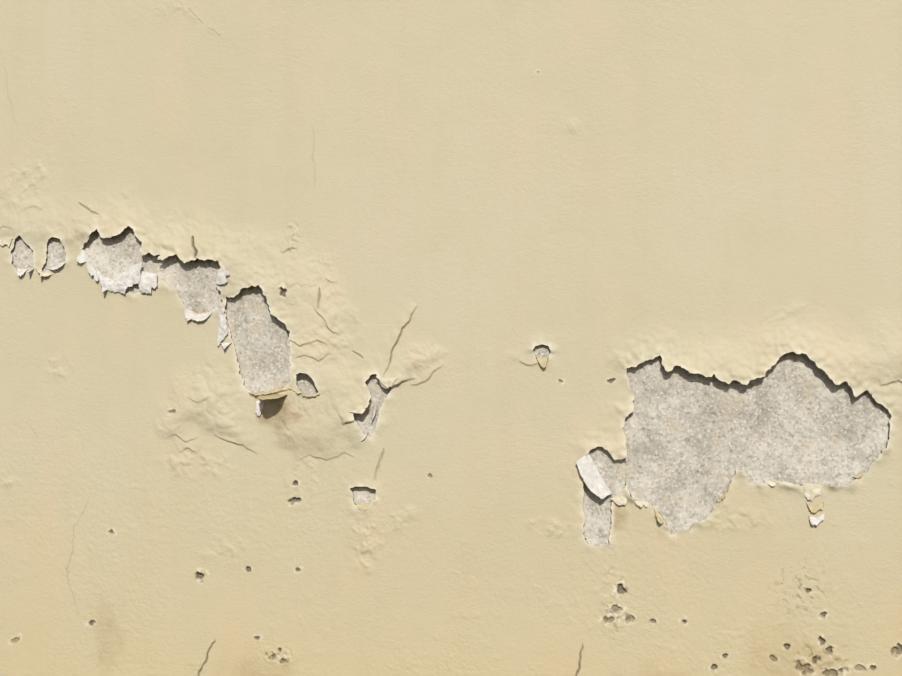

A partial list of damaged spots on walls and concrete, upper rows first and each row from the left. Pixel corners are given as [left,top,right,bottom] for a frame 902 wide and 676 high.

peeling [0,222,325,416]
crack [351,303,425,379]
peeling [527,338,555,368]
peeling [345,369,399,445]
peeling [576,344,898,551]
peeling [347,480,383,513]
crack [190,638,220,676]
crack [572,642,587,676]